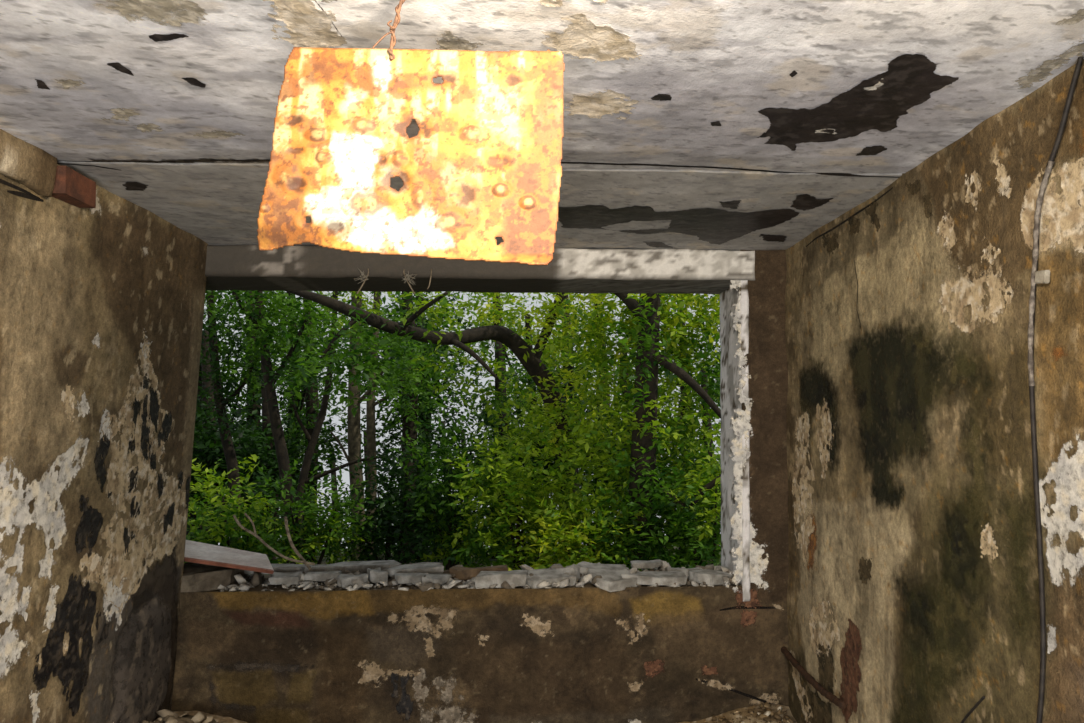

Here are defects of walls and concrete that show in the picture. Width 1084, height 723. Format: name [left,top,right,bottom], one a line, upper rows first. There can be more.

peeling [758,54,959,151]
crack [0,179,44,202]
peeling [558,194,833,248]
peeling [905,179,1014,334]
peeling [1020,157,1084,256]
peeling [0,328,187,678]
peeling [725,280,769,628]
water stain [800,360,839,470]
water stain [858,557,872,588]
water stain [849,320,992,509]
water stain [943,509,978,588]
peeling [1039,434,1084,586]